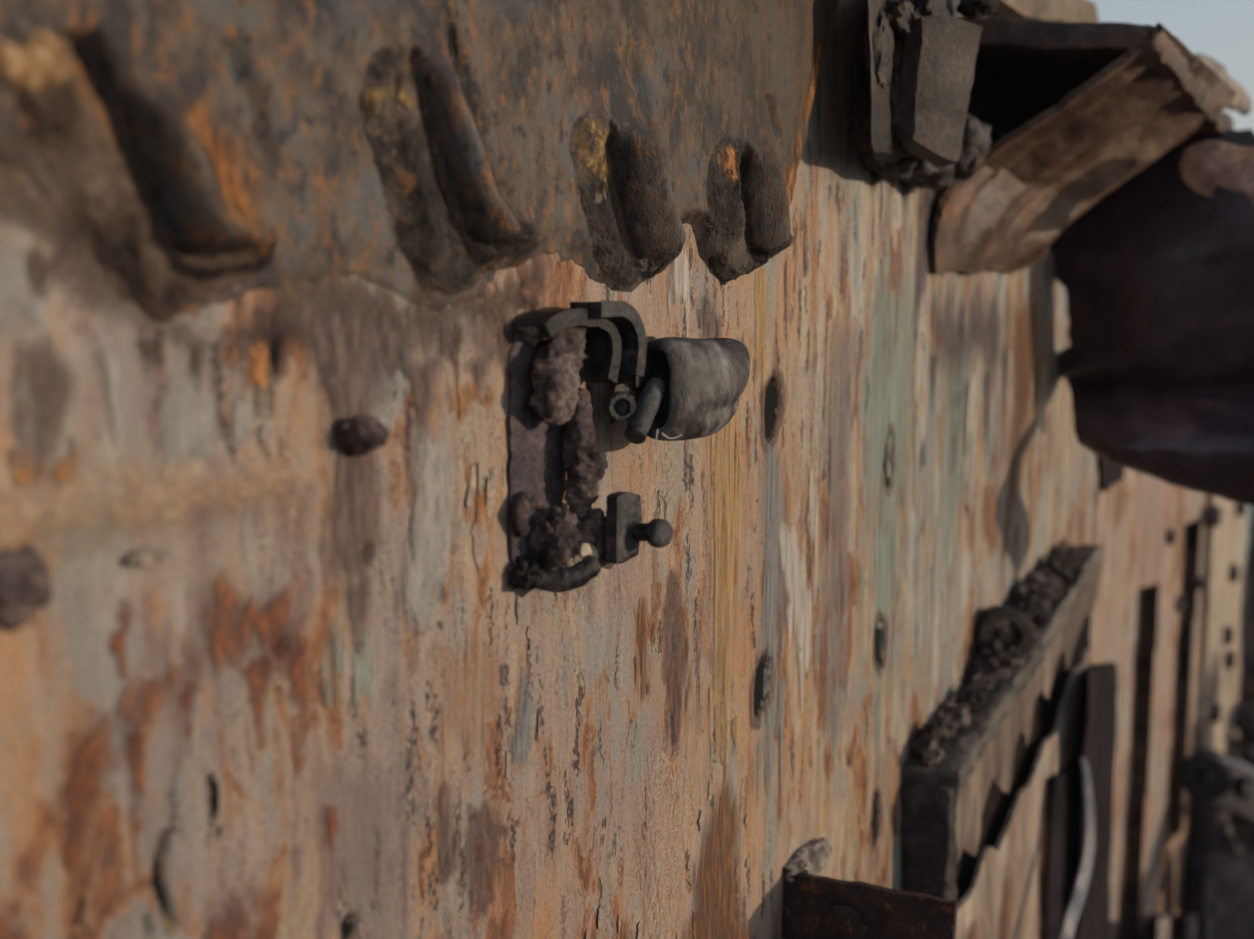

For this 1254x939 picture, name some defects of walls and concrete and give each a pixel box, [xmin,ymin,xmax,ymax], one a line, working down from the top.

corrosion [805,3,838,120]
corrosion [189,106,262,223]
corrosion [0,141,204,375]
peeling [465,462,496,571]
peeling [579,543,599,559]
corrosion [64,578,309,872]
peeling [676,779,758,939]